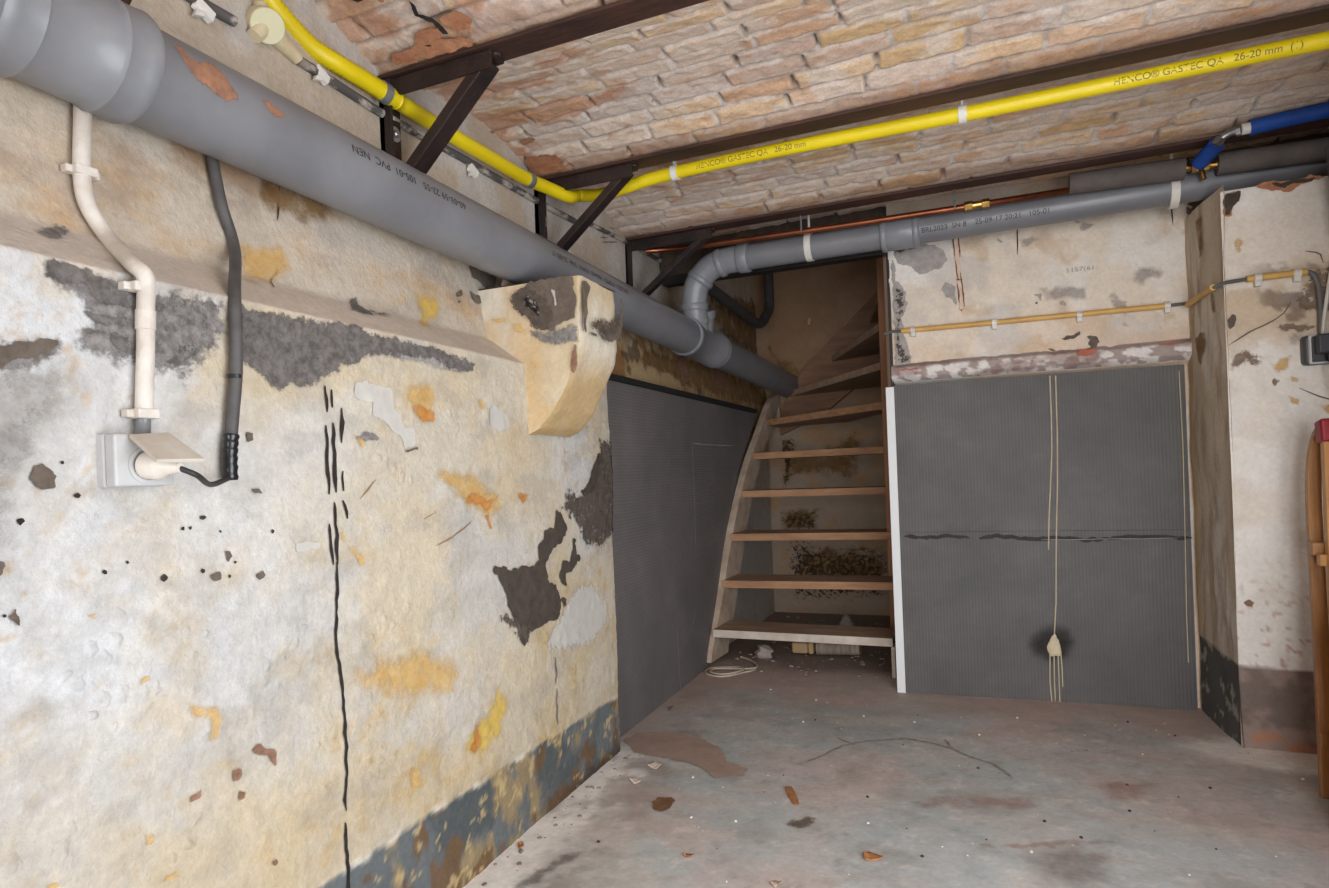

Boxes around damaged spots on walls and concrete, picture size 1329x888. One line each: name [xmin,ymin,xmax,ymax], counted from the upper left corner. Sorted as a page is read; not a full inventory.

spalling [0,338,62,371]
leakage [782,438,858,483]
crack [425,512,471,546]
spalling [494,438,613,652]
leakage [781,510,888,601]
crack [904,533,1192,543]
crack [324,385,376,888]